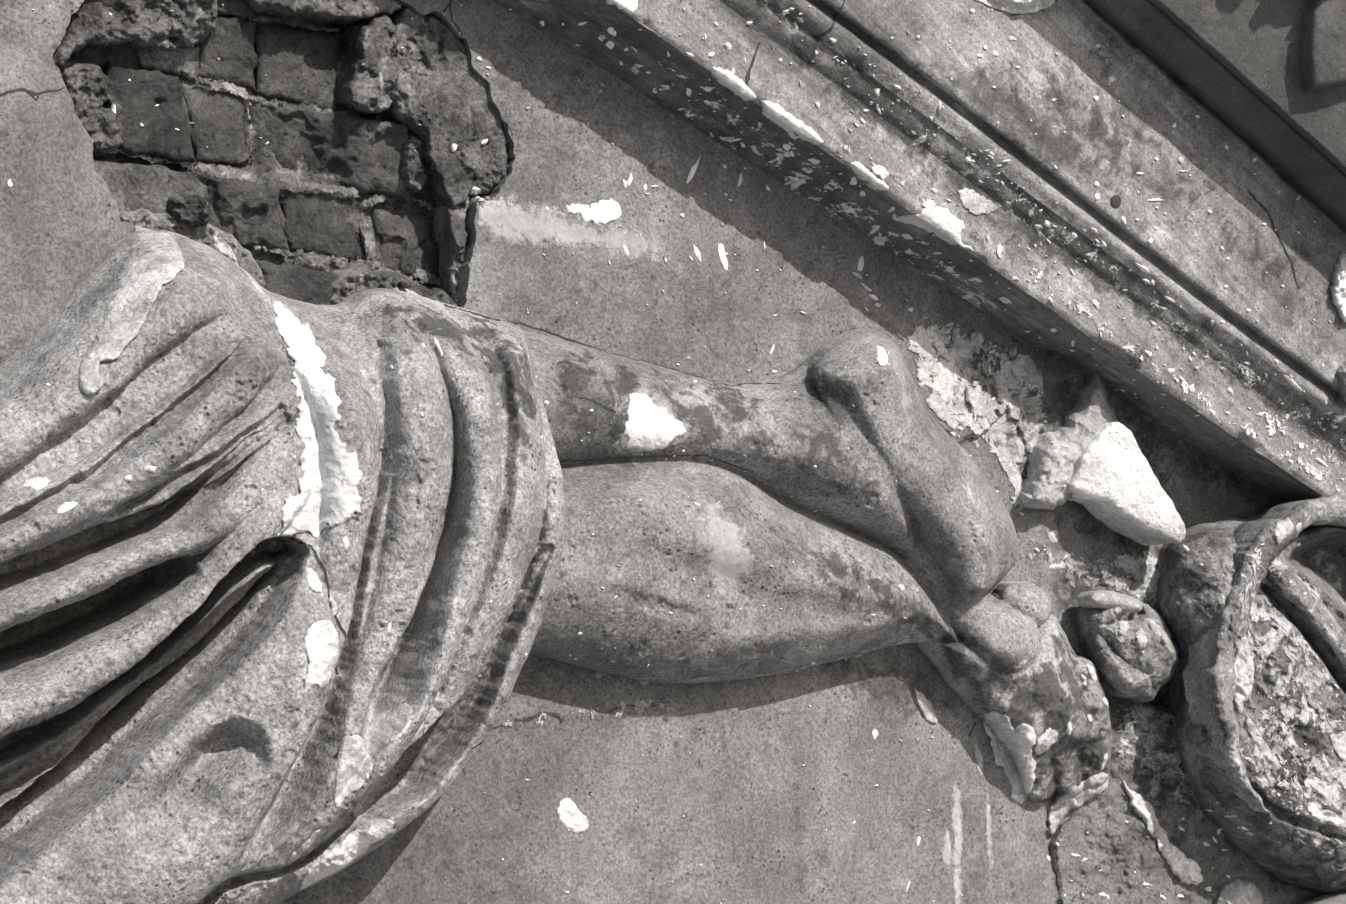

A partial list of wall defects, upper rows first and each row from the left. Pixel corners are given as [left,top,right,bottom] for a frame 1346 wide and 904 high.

flaking render [976,0,1055,14]
crack [0,87,65,101]
flaking render [53,0,509,539]
peeling [652,61,1002,310]
crack [1248,190,1299,289]
peeling [623,392,686,451]
peeling [907,318,1048,515]
peeling [1022,266,1346,491]
crack [289,537,347,675]